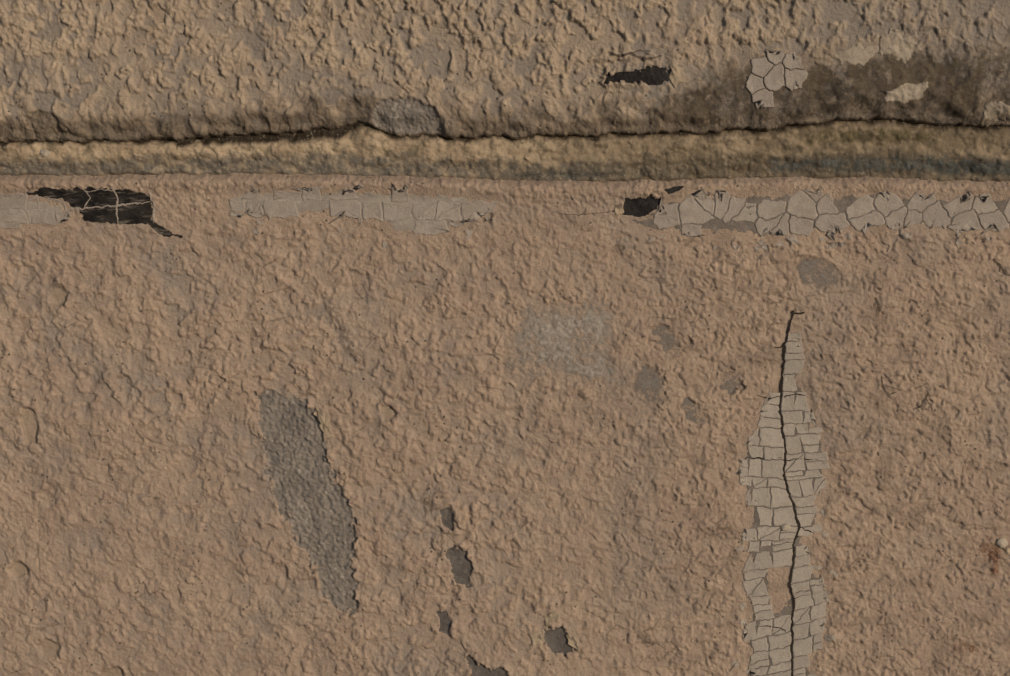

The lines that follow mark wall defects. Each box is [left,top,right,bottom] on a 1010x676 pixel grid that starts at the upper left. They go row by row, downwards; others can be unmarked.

peeling [604,65,686,93]
peeling [745,49,808,109]
water stain [669,49,1010,126]
flaking render [884,82,928,104]
flaking render [979,99,1010,122]
water stain [772,154,1010,175]
peeling [0,186,183,238]
peeling [229,183,499,239]
peeling [614,182,1010,251]
peeling [254,389,360,616]
crack [745,310,818,676]
peeling [732,333,838,676]